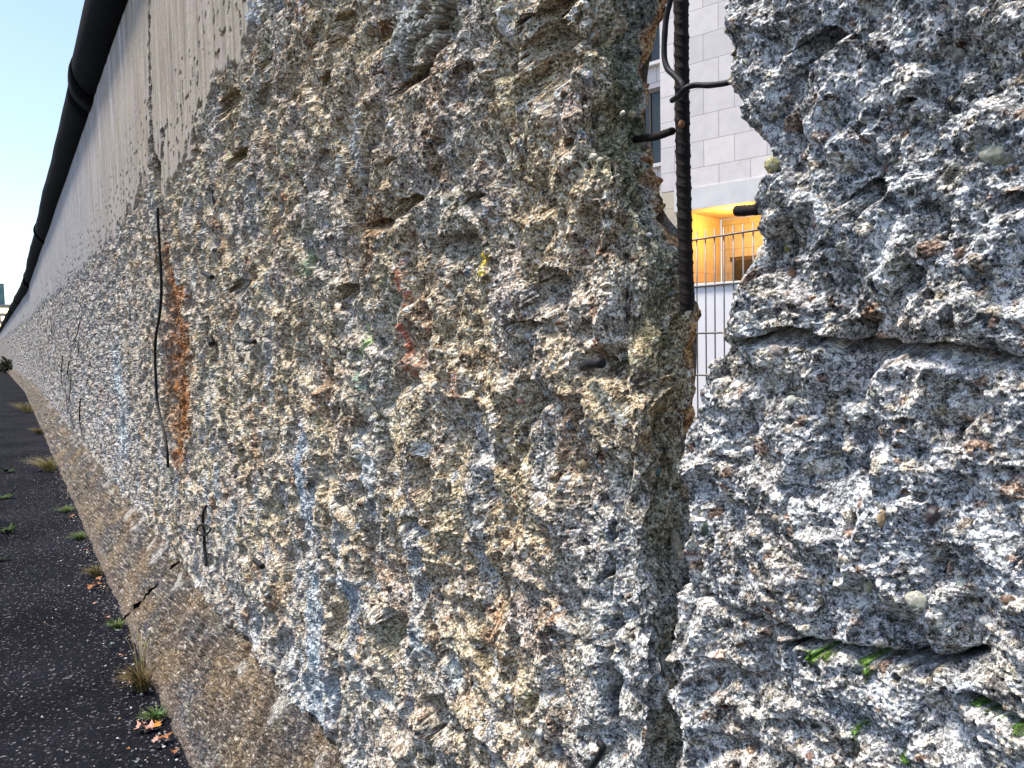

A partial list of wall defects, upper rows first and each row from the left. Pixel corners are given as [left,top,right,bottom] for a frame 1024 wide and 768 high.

rust [170,280,198,475]